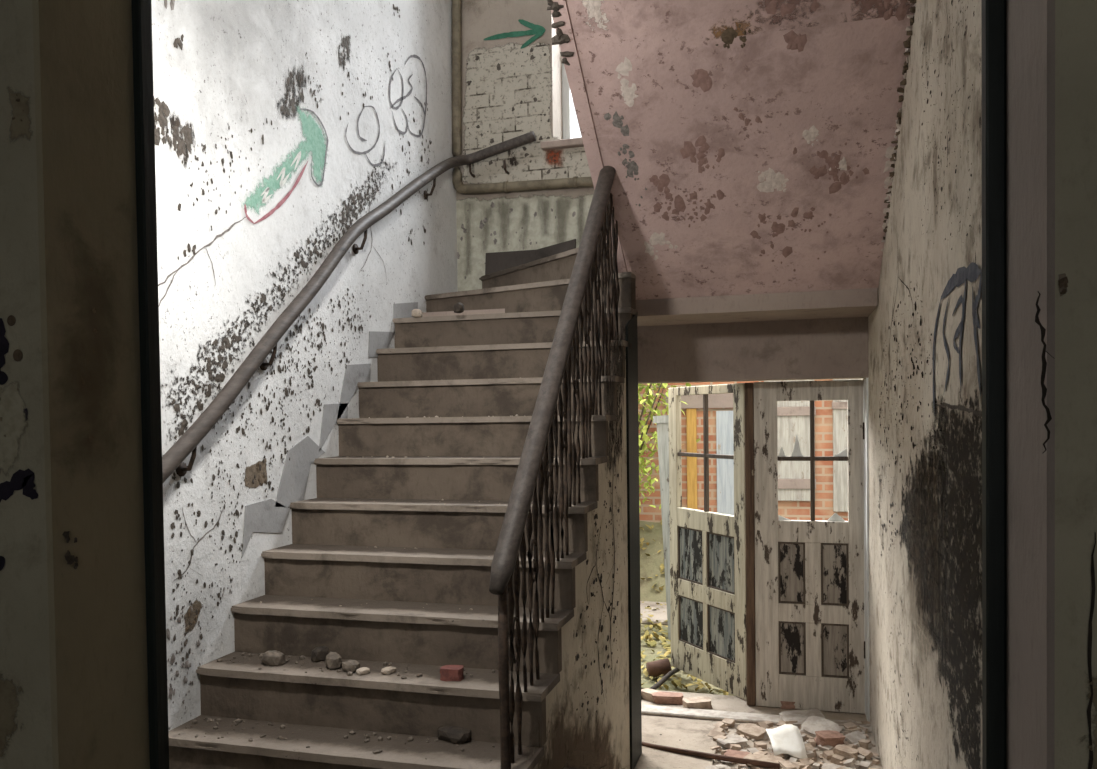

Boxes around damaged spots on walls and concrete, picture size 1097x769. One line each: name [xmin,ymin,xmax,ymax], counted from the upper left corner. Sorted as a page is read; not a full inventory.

peeling [154,52,327,231]
peeling [334,36,396,120]
leakage [690,69,712,92]
leakage [680,135,725,173]
leakage [707,0,820,52]
leakage [845,0,915,22]
peeling [161,102,432,444]
crack [1035,291,1055,453]
spalling [166,284,371,704]
leakage [899,383,982,769]
crack [1087,532,1096,769]